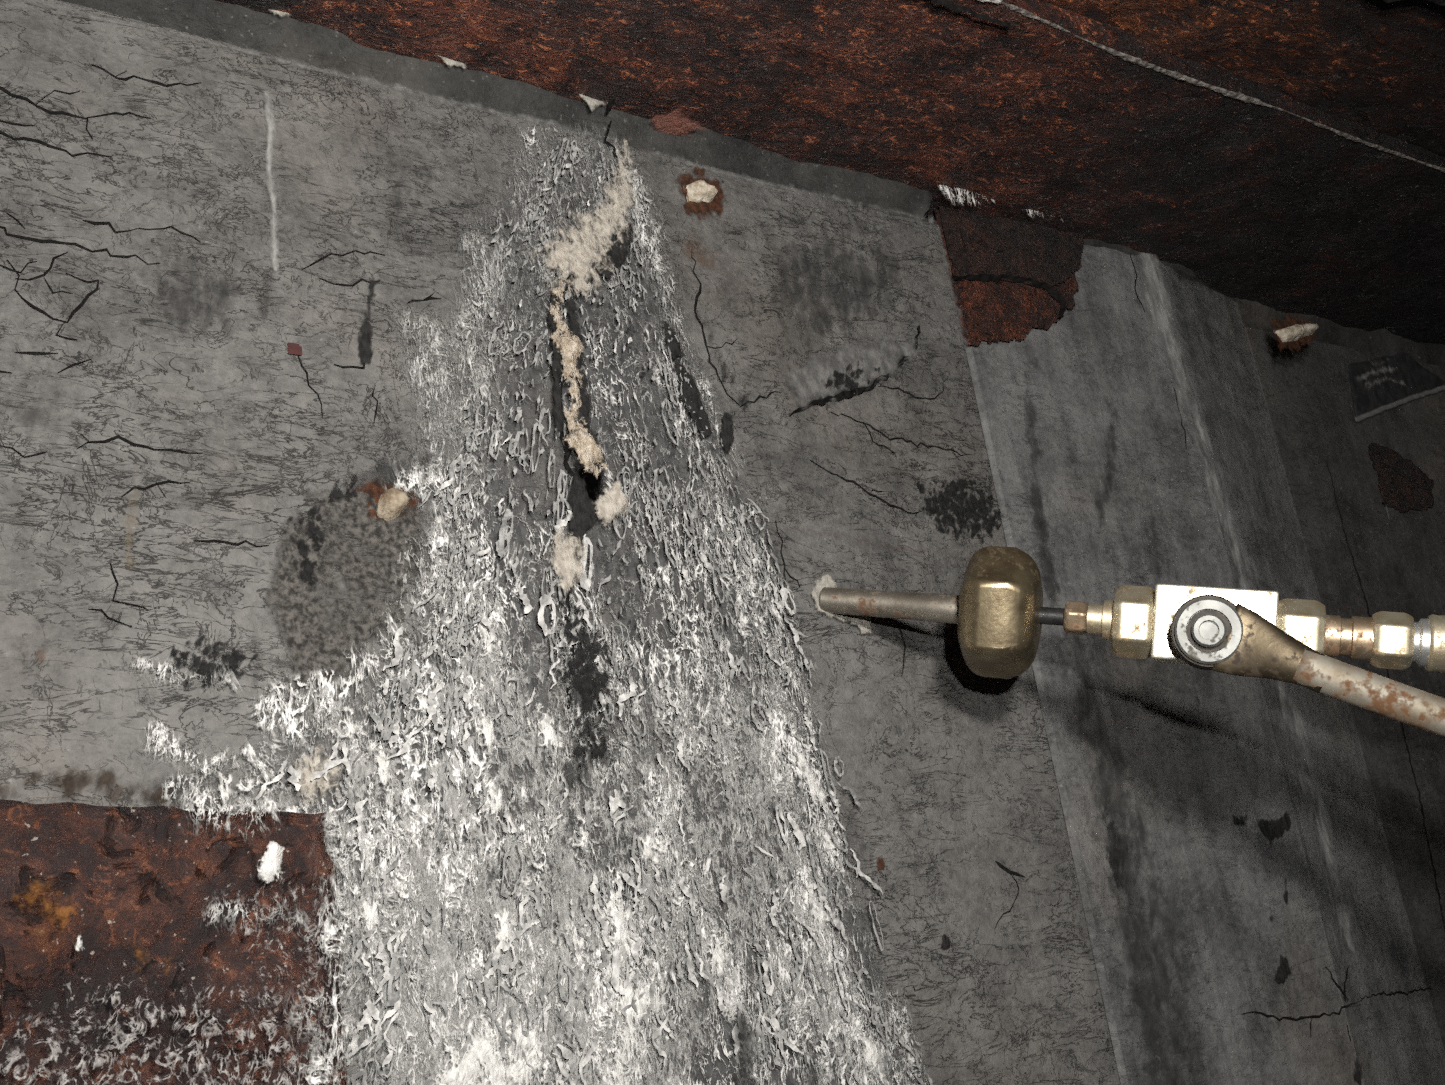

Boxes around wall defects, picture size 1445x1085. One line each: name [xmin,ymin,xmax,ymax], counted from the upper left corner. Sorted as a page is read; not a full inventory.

crack [0,64,201,157]
rust [678,167,724,218]
crack [0,213,200,373]
crack [302,250,384,286]
crack [407,293,442,304]
spalling [934,185,1085,346]
rust [1270,315,1316,351]
crack [298,355,378,422]
crack [0,433,197,498]
crack [540,99,663,773]
leakage [0,126,933,1085]